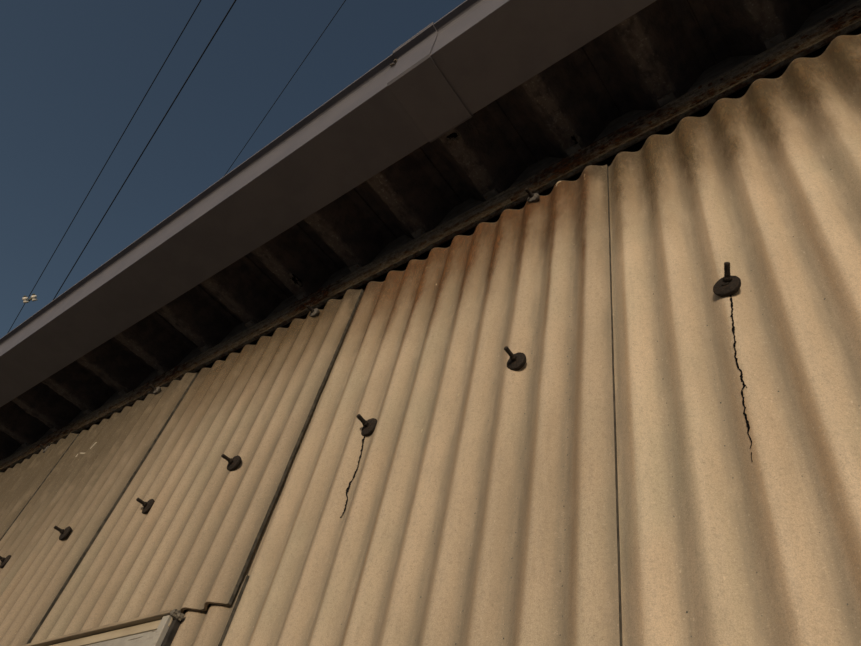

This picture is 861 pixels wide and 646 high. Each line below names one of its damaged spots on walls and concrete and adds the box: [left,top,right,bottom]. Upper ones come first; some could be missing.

corrosion [376,181,571,316]
crack [730,295,753,462]
crack [340,436,365,518]